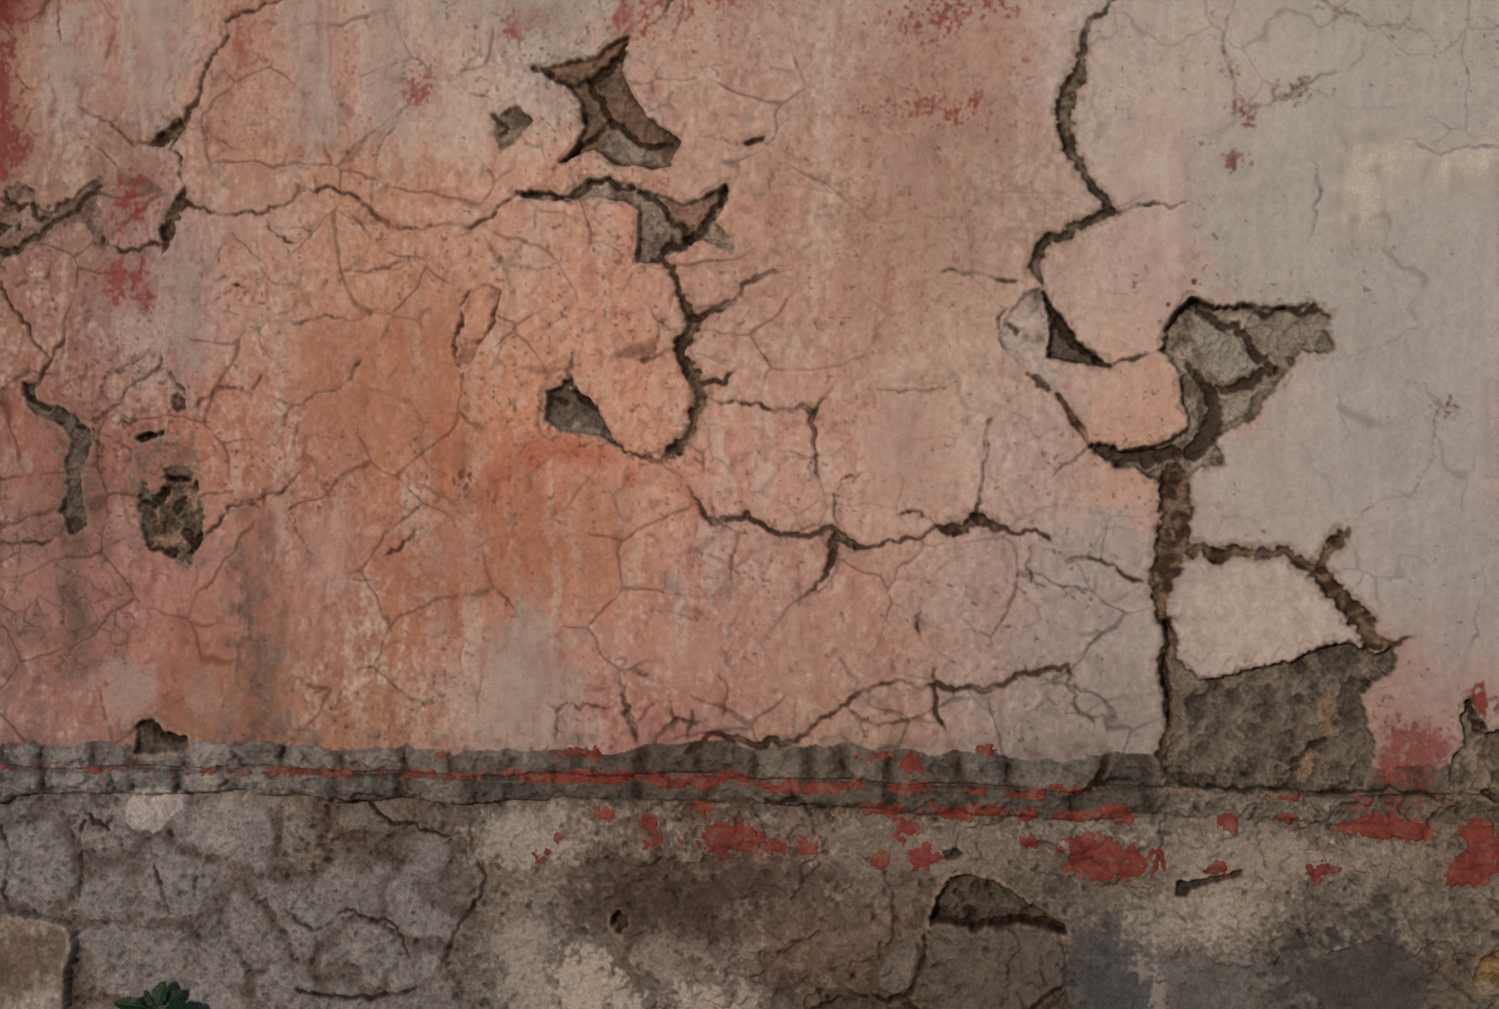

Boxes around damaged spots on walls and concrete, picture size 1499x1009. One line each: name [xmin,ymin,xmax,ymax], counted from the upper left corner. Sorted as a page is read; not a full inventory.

crack [0,180,110,407]
crack [78,0,517,455]
spalling [545,379,618,445]
spalling [515,35,734,264]
peeling [997,287,1114,392]
crack [939,0,1203,289]
spalling [1088,297,1336,486]
crack [547,258,1492,812]
crack [75,743,231,920]
crack [285,746,488,1009]
peeling [0,718,1166,888]
spalling [1158,620,1499,888]